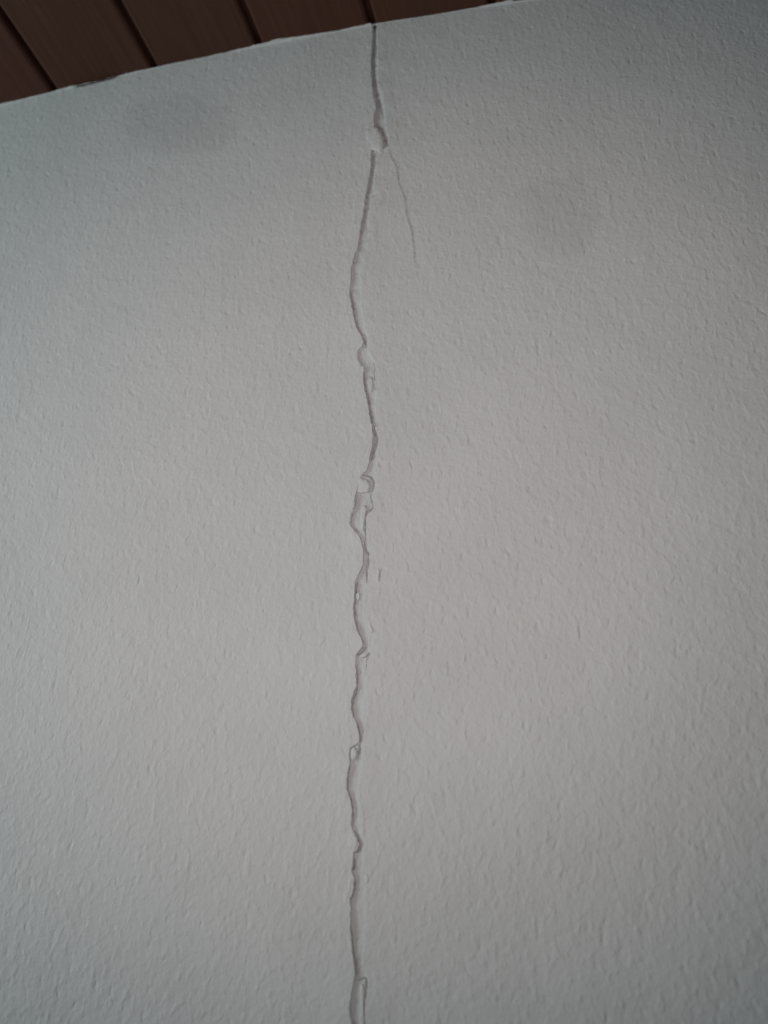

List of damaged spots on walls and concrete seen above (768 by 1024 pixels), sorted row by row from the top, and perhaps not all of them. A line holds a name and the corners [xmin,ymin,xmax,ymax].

crack [346,21,415,1024]